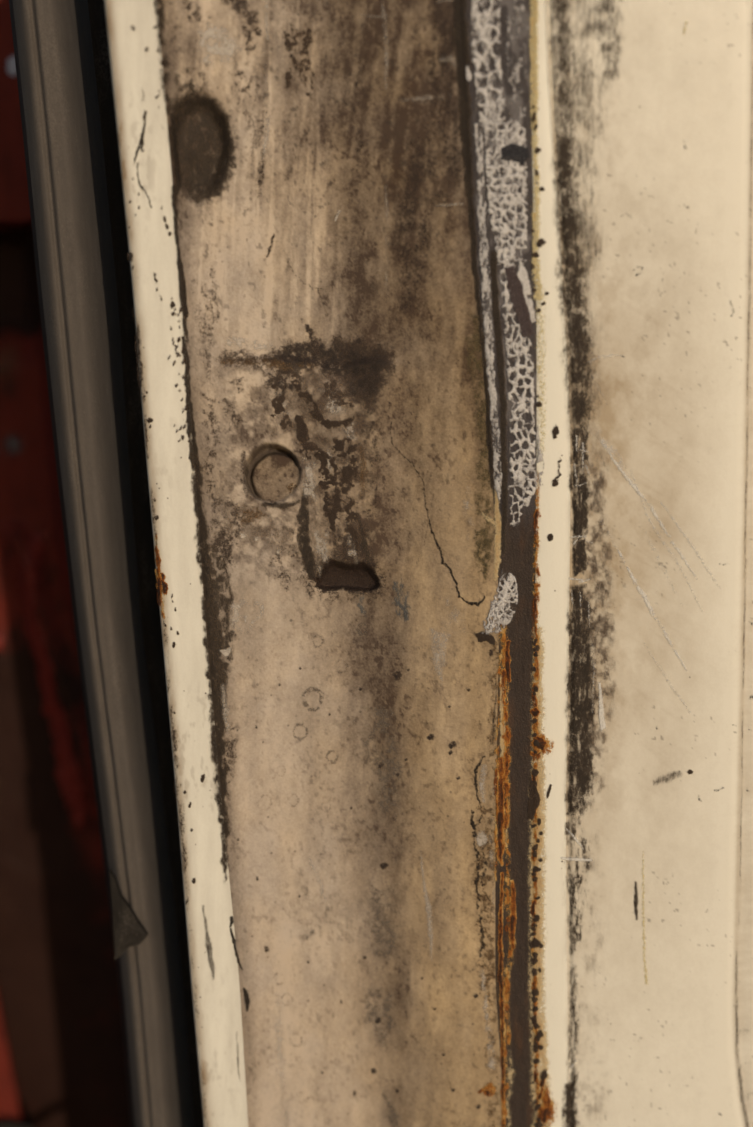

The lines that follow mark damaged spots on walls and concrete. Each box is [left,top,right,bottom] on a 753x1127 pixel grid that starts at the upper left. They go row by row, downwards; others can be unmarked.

spalling [501,143,530,166]
spalling [504,265,533,337]
corrosion [151,492,168,619]
water stain [154,0,396,880]
crack [389,394,518,634]
water stain [551,0,619,1127]
corrosion [473,472,557,1127]